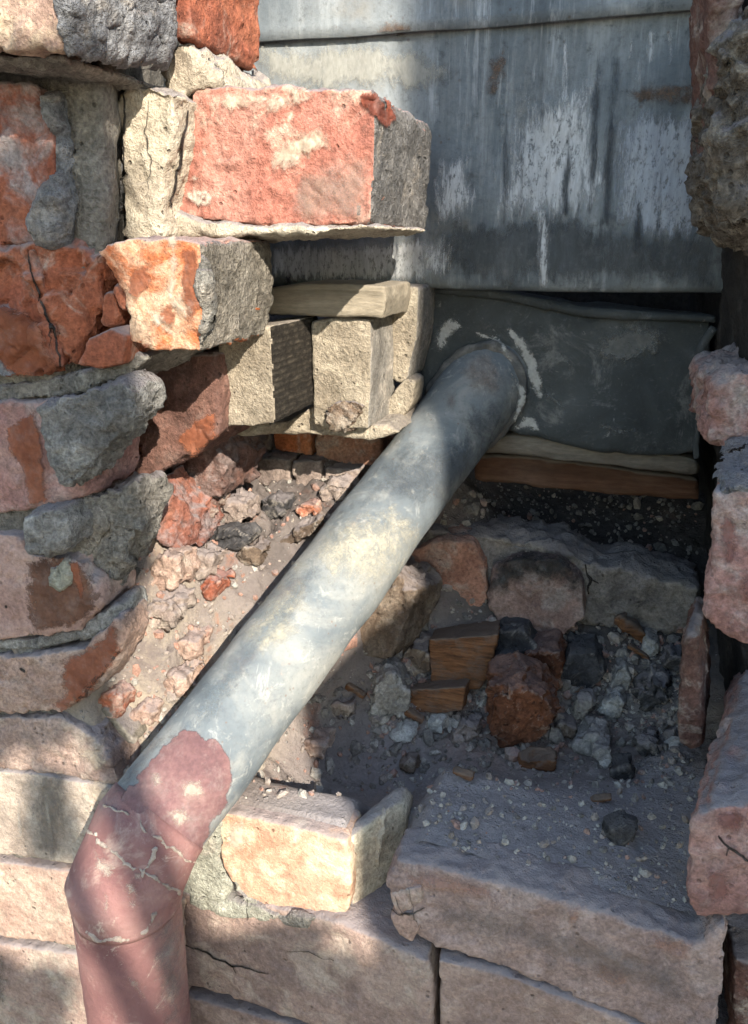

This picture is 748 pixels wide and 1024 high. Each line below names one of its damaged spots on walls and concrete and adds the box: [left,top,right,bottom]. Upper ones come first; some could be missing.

crack [122,91,189,208]
water stain [271,45,711,285]
crack [27,249,61,367]
efflorescence [437,319,461,348]
efflorescence [476,329,560,430]
water stain [381,440,470,495]
peeling [184,782,202,795]
crack [186,945,268,974]